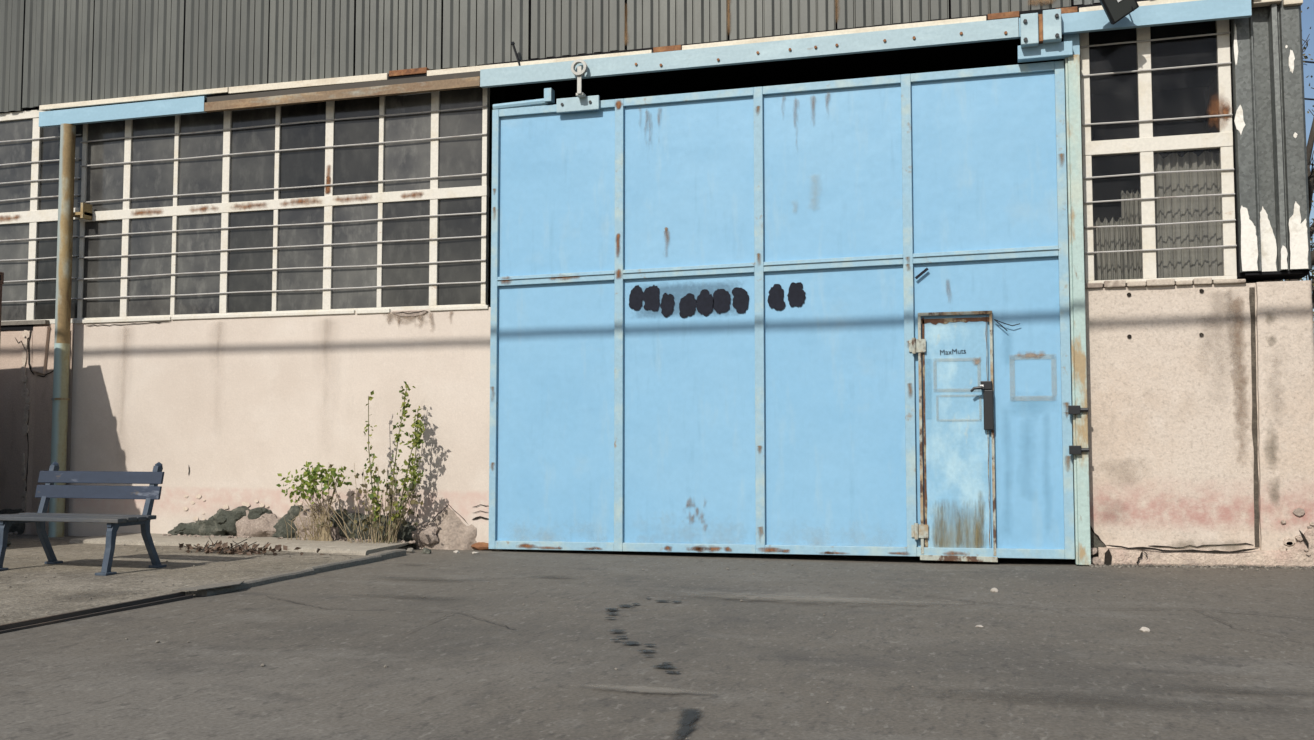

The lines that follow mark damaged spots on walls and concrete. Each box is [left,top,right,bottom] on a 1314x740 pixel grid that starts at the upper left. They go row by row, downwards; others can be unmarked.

damp [1231,298,1245,417]
rust [908,316,990,555]
spalling [1279,508,1314,556]